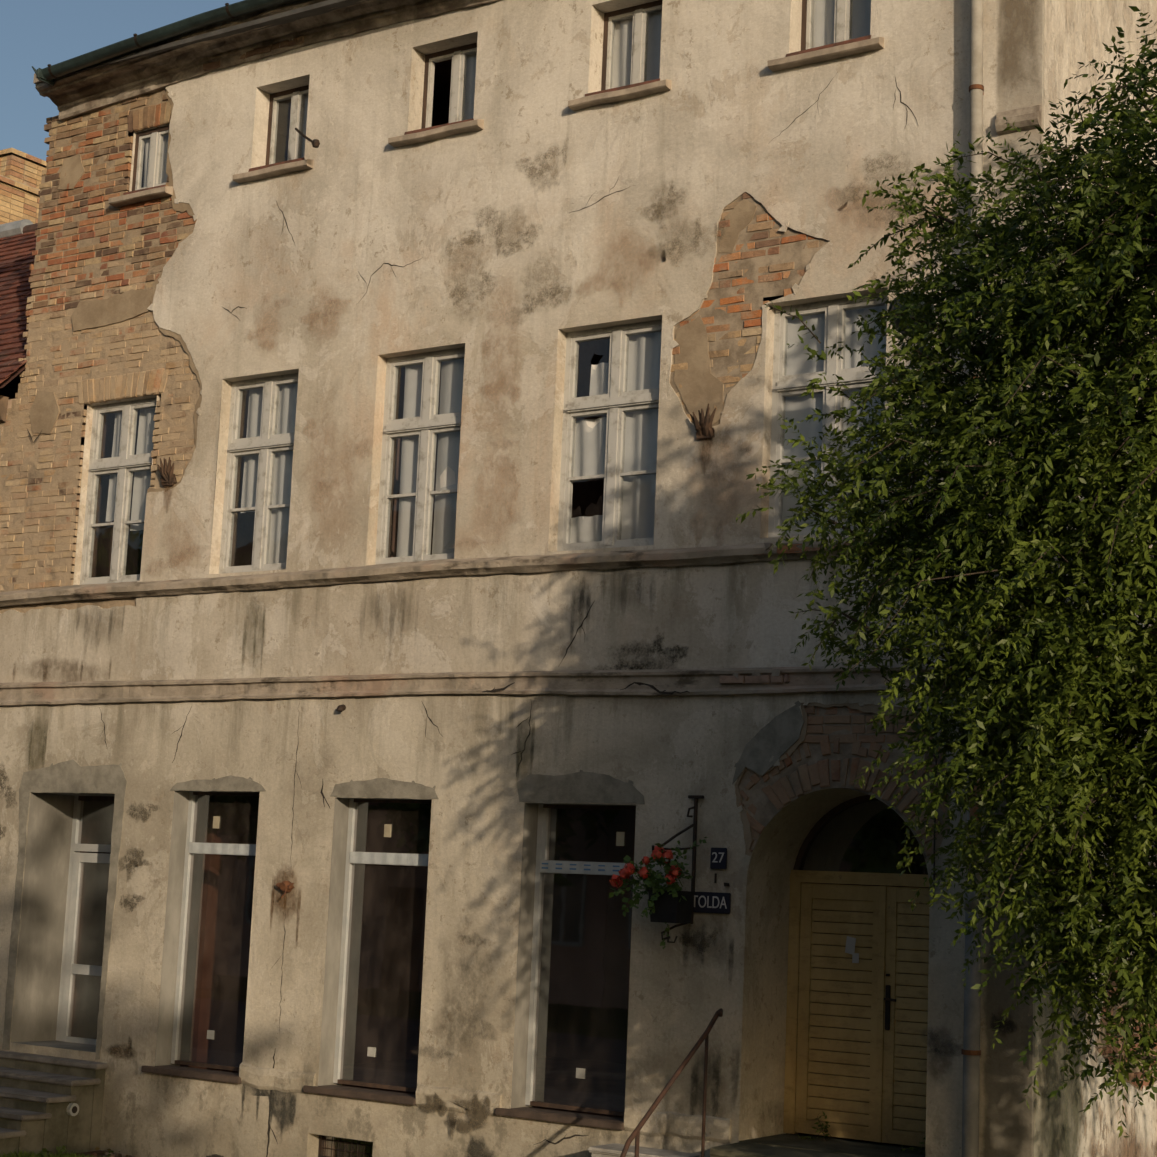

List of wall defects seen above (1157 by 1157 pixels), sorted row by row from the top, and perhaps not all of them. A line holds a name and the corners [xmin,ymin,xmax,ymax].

crack [768,73,837,144]
crack [570,177,635,213]
spalling [0,89,203,592]
crack [357,257,423,304]
spalling [669,192,829,429]
spalling [0,597,136,614]
crack [558,600,595,667]
crack [482,682,532,777]
spalling [735,700,955,862]
corrosion [271,873,301,917]
crack [266,908,286,1157]
spalling [1095,950,1157,1096]